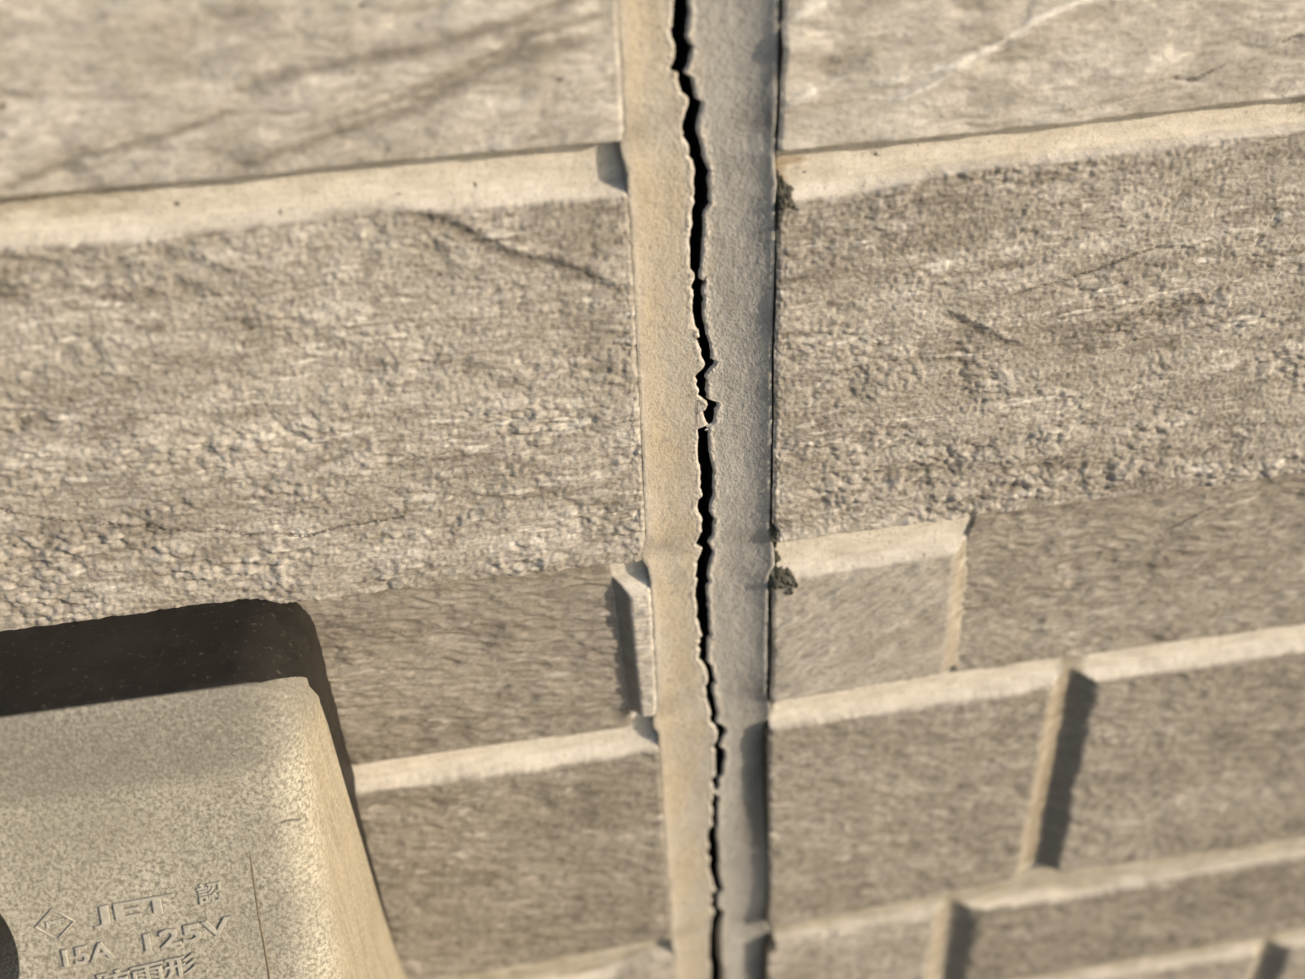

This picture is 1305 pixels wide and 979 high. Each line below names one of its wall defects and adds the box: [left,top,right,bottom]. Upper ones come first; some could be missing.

crack [670,0,726,979]